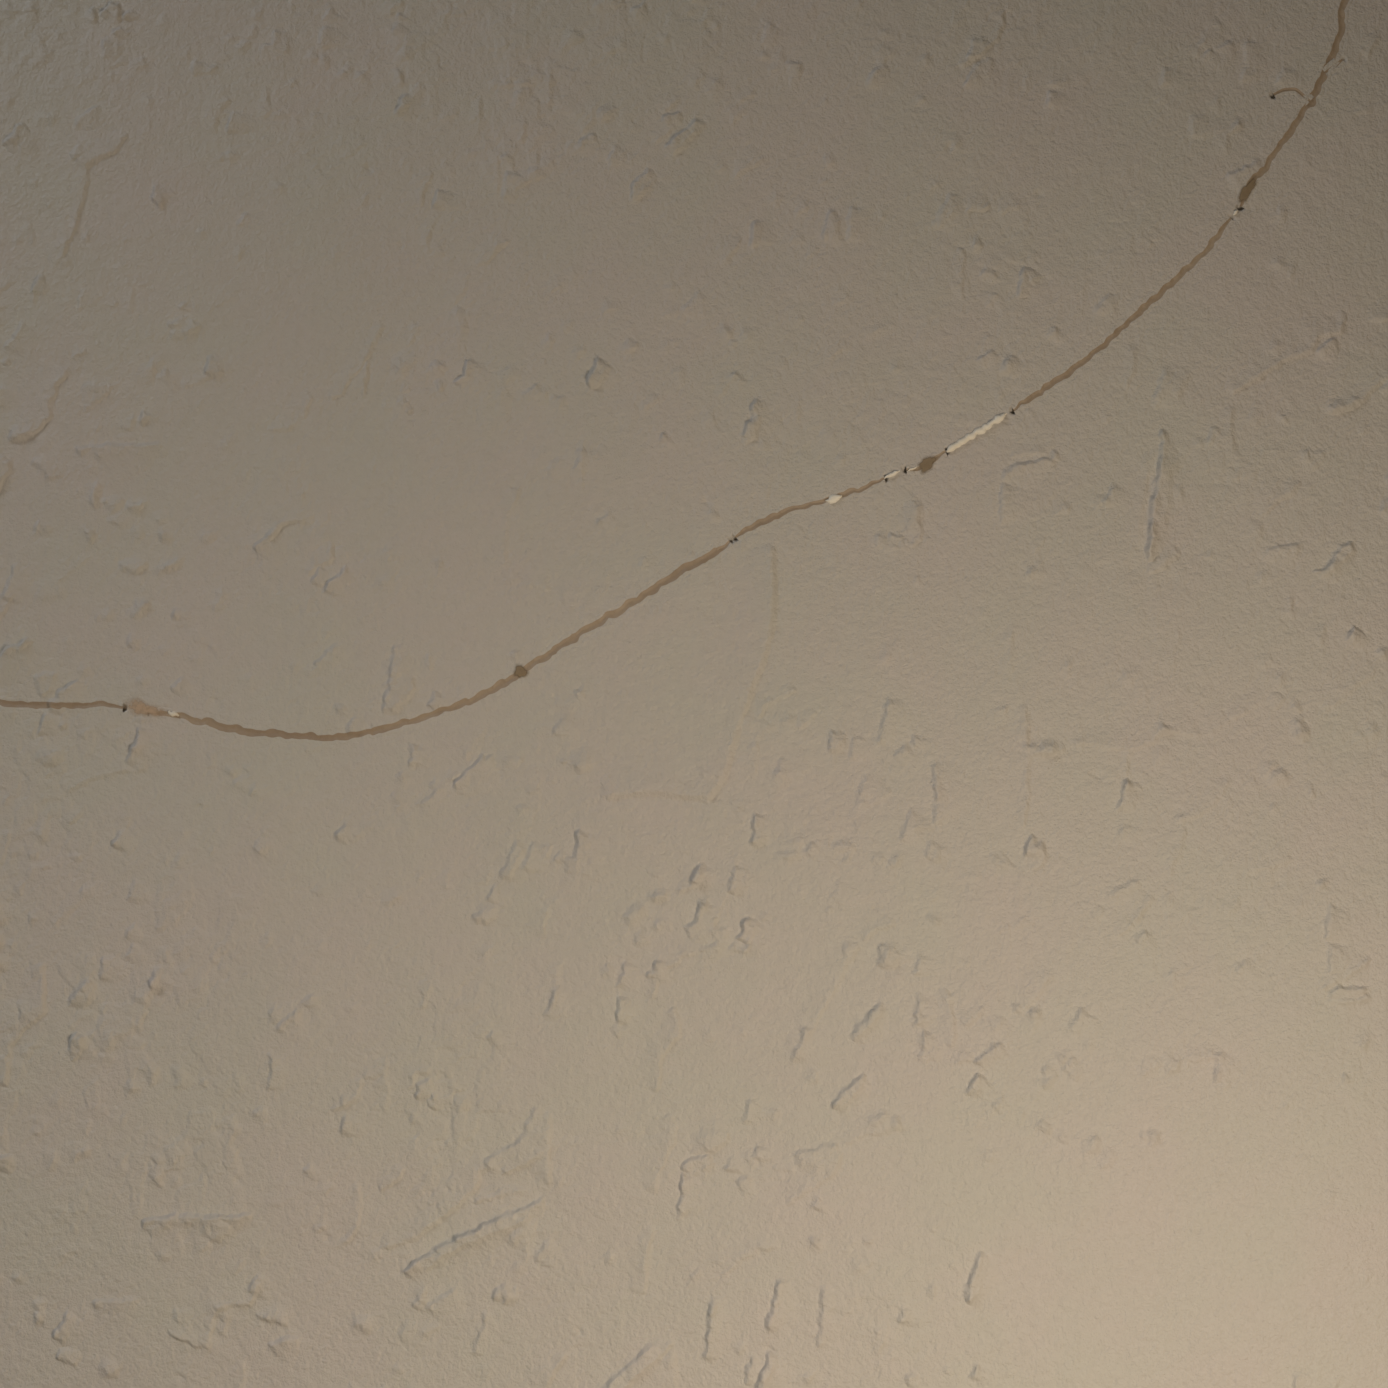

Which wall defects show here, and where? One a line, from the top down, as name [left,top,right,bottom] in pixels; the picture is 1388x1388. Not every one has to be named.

crack [0,0,1353,745]